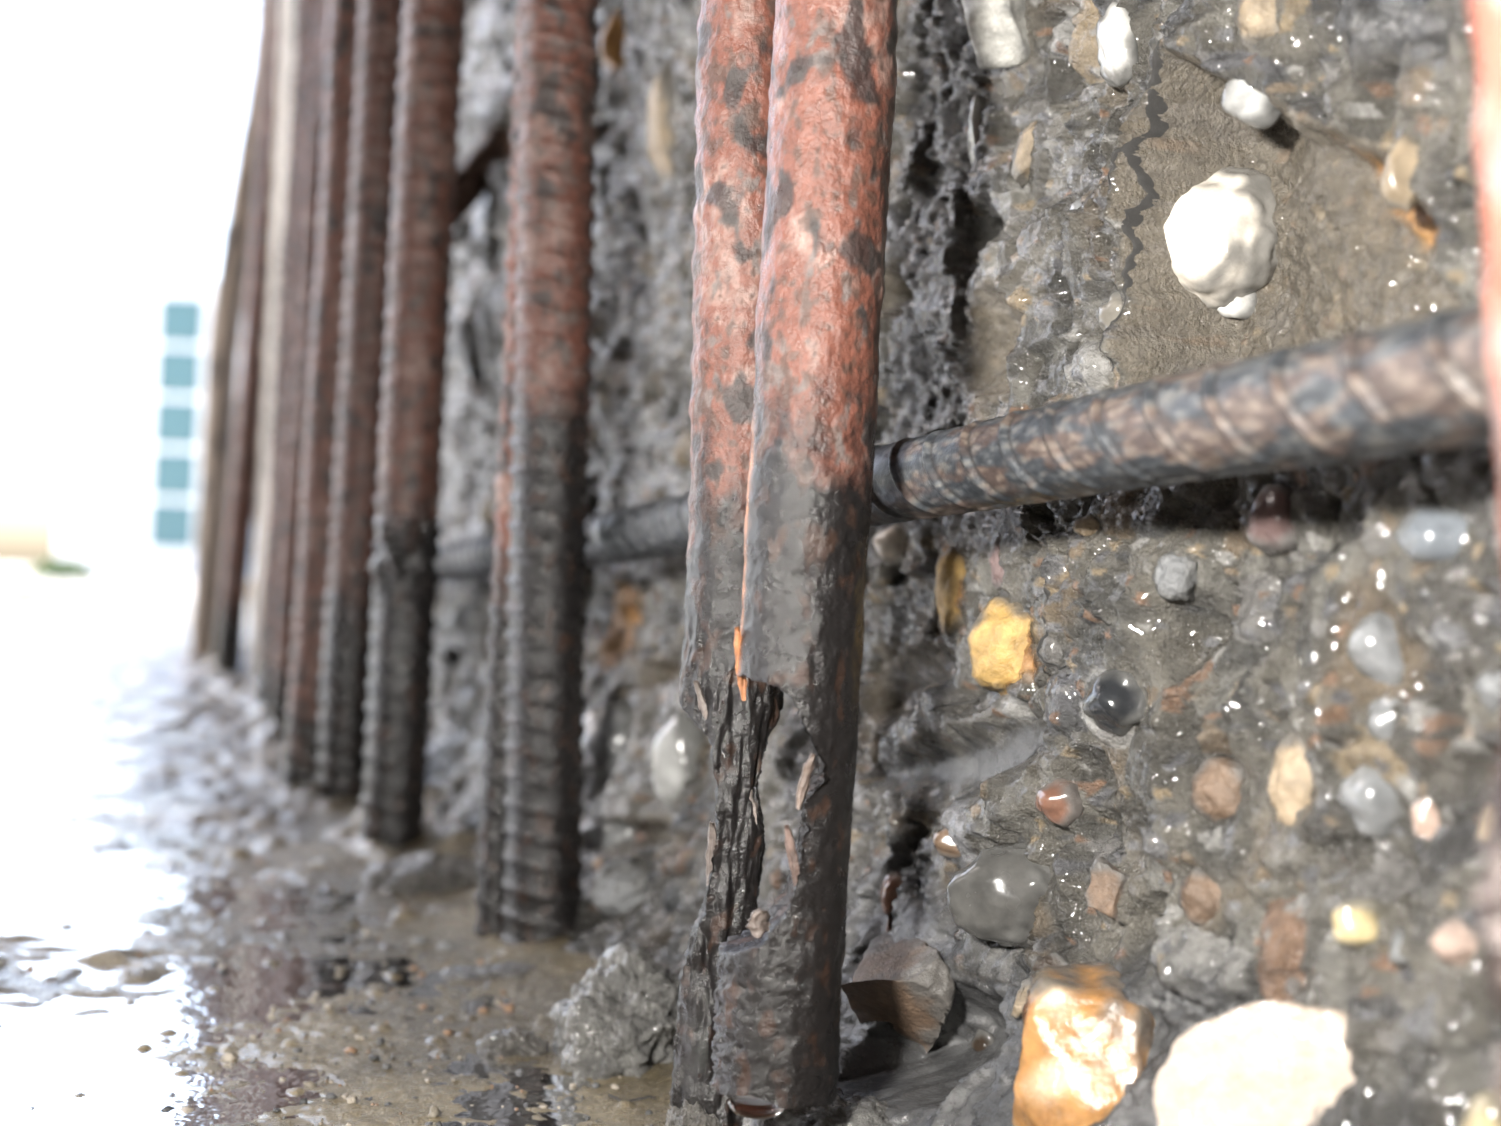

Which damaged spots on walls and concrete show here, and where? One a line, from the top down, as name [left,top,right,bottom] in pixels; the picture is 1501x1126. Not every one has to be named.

spalling [189,0,280,675]
spalling [256,0,960,1126]
spalling [870,0,1501,527]
spalling [1475,760,1501,1010]